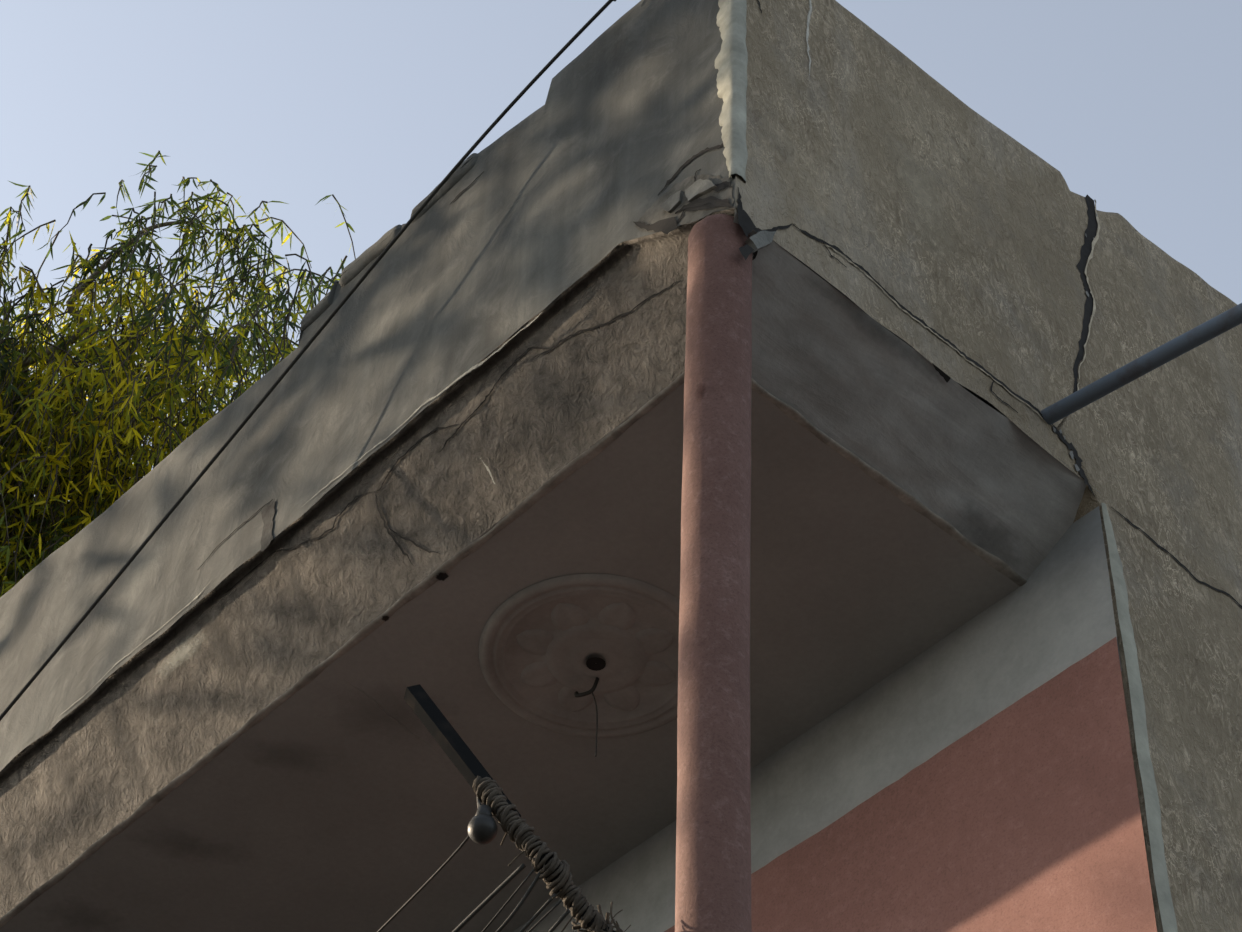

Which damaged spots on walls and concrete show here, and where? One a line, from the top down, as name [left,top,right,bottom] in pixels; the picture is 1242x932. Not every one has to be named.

flaking render [634,0,776,260]
crack [634,143,1047,423]
crack [1073,195,1100,393]
crack [199,499,273,568]
crack [226,280,681,593]
crack [1113,508,1242,607]